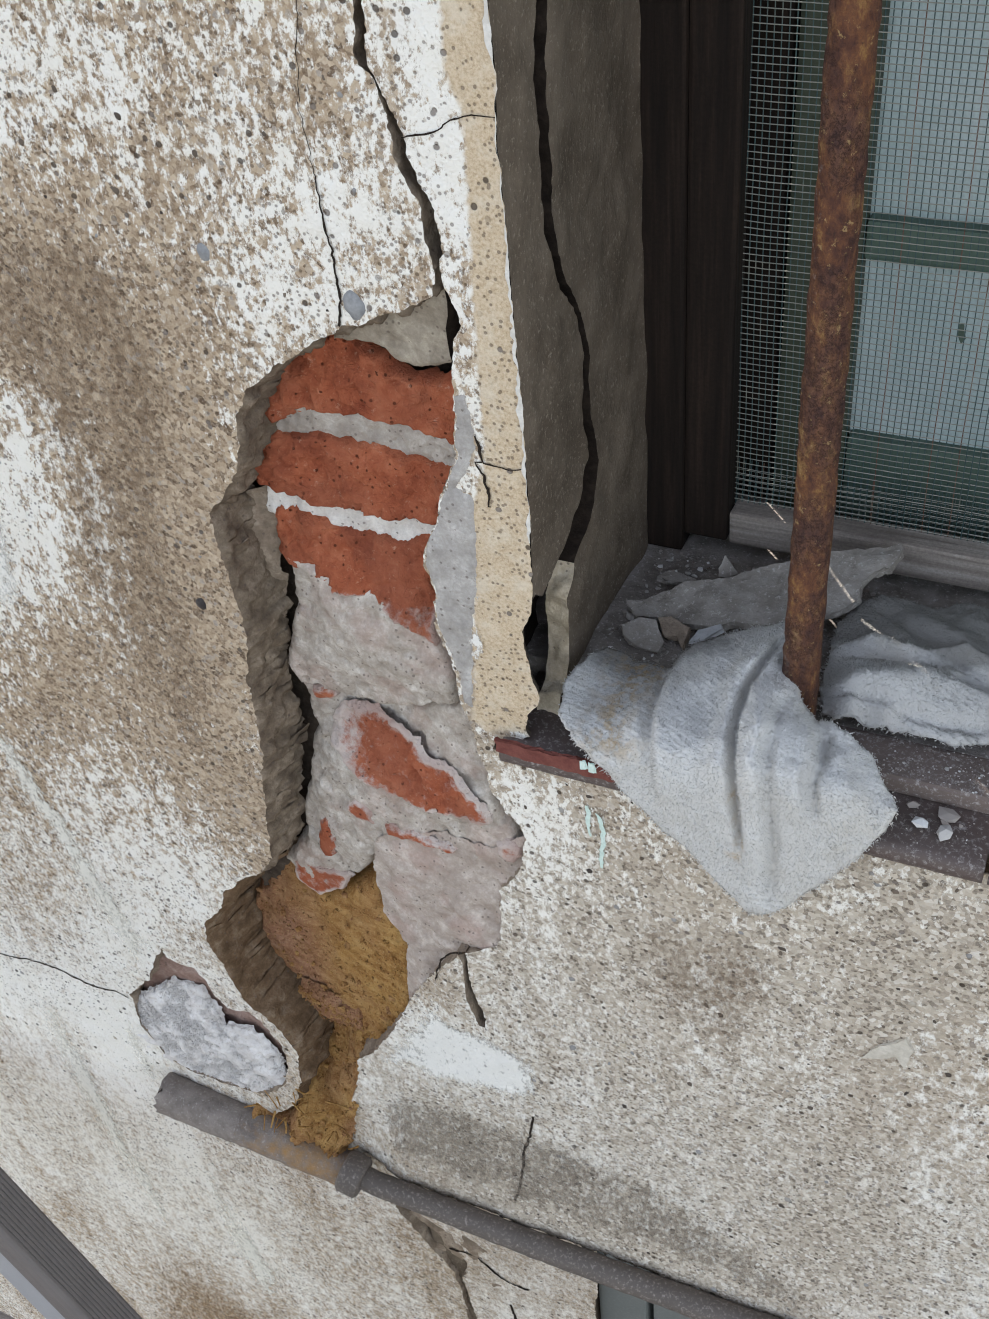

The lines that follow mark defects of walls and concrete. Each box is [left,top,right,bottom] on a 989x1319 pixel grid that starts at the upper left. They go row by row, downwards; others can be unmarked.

crack [295,0,342,327]
crack [353,0,519,373]
crack [474,431,529,507]
crack [522,0,599,736]
spalling [129,264,526,1111]
crack [435,943,486,1028]
crack [396,1205,529,1319]